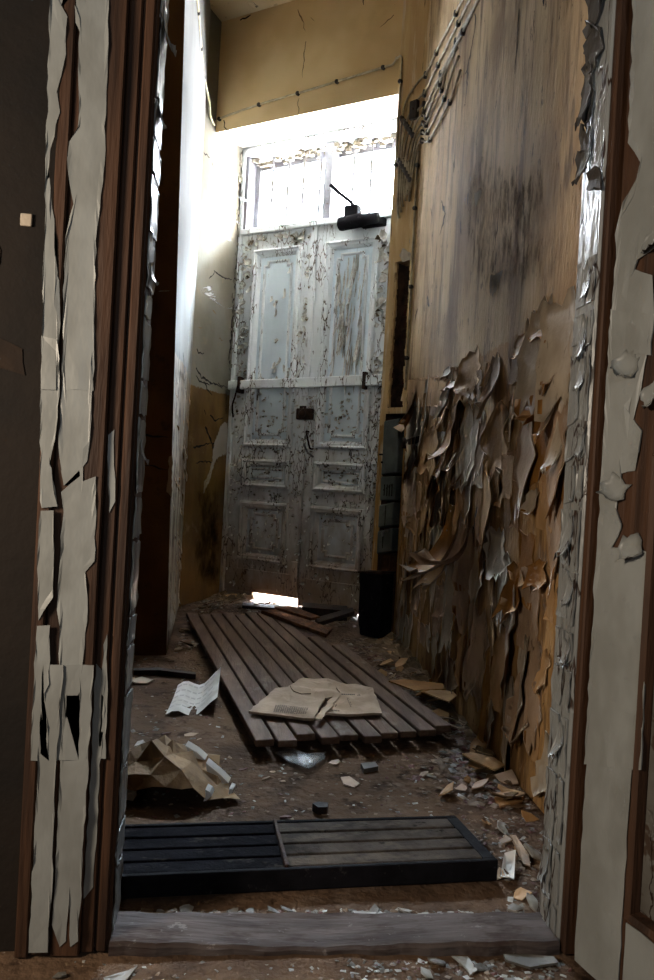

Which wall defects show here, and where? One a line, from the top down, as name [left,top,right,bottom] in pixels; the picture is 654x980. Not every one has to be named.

peeling [28,0,109,953]
peeling [107,430,115,512]
peeling [112,0,177,930]
peeling [166,416,189,614]
peeling [197,210,597,935]
peeling [596,471,632,501]
peeling [615,533,642,562]
peeling [640,381,654,409]